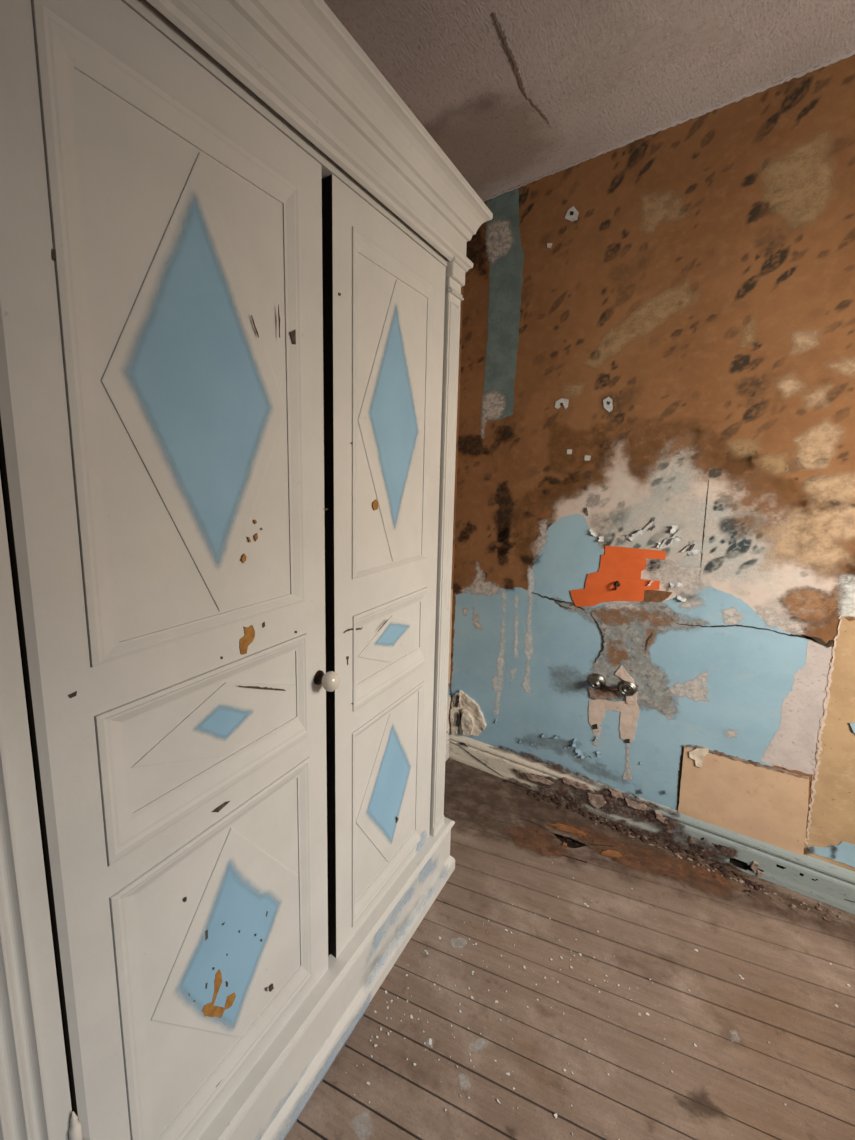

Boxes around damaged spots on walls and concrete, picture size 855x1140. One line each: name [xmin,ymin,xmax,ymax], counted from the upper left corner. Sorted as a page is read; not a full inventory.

crack [492,12,549,124]
damp [458,427,514,456]
peeling [448,562,500,684]
crack [532,592,604,662]
flaking render [519,517,709,823]
damp [491,420,855,715]
peeling [722,608,744,624]
flaking render [756,607,855,872]
spalling [551,836,583,861]